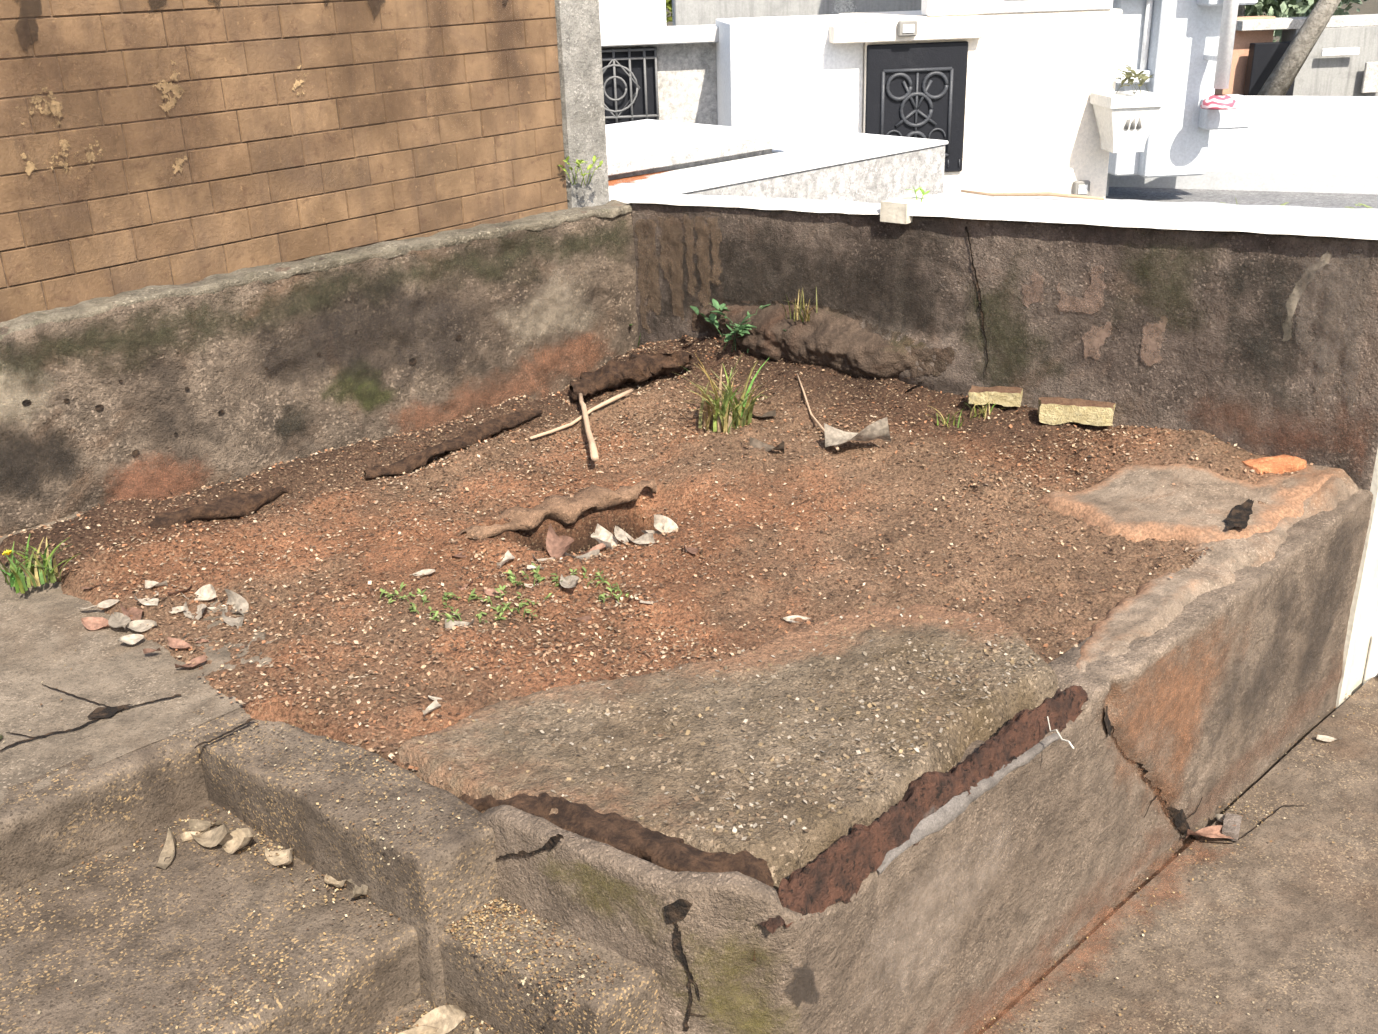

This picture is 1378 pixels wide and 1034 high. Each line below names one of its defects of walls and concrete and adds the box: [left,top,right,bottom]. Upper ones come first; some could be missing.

leakage [264,290,471,376]
leakage [1246,252,1332,368]
leakage [0,431,80,498]
leakage [277,406,306,437]
spalling [1226,499,1254,529]
crack [0,684,181,751]
spalling [754,685,1088,934]
crack [1104,706,1203,840]
crack [663,899,706,1032]